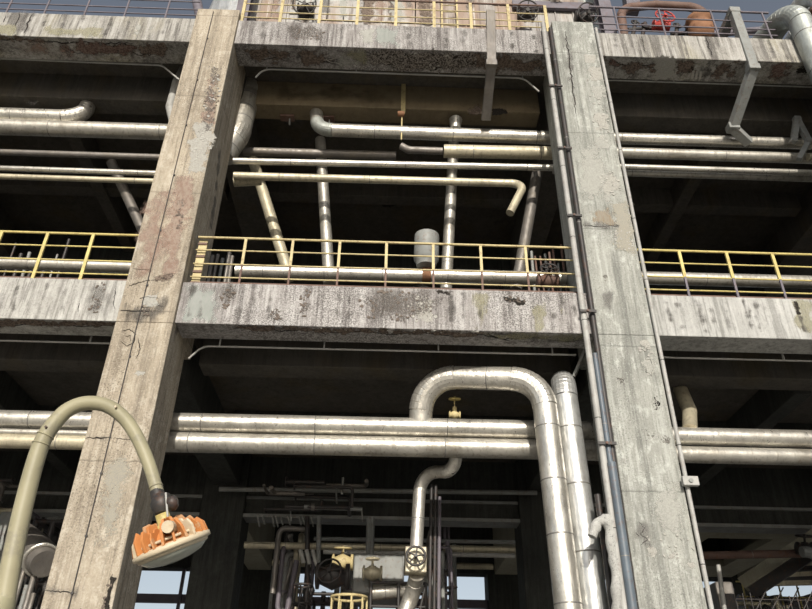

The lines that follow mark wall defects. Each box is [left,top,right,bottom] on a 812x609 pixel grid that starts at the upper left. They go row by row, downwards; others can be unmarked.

crack [565,31,576,113]
rust [710,59,742,79]
rust [767,62,792,80]
leakage [793,300,812,332]